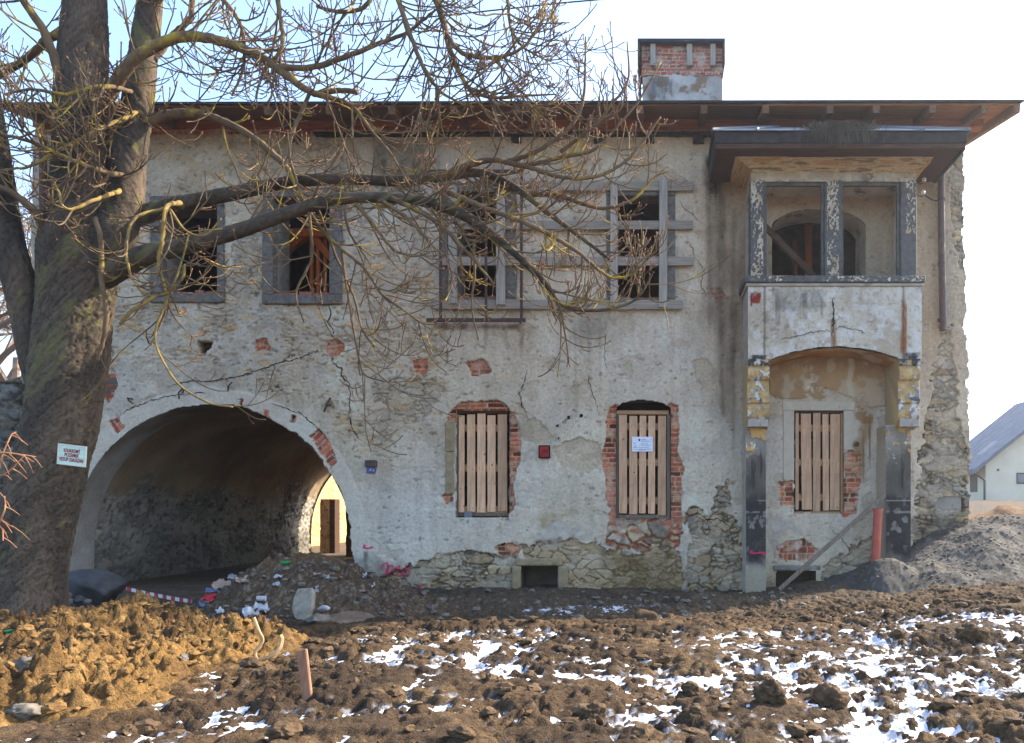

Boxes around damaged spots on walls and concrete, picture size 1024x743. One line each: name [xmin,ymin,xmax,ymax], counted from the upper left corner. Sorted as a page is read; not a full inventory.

peeling [751,172,923,281]
crack [781,299,867,340]
crack [123,307,358,440]
flaking render [310,428,338,469]
flaking render [371,358,742,591]
flaking render [746,357,885,458]
flaking render [842,451,863,519]
flaking render [886,325,971,543]
flaking render [776,536,872,581]